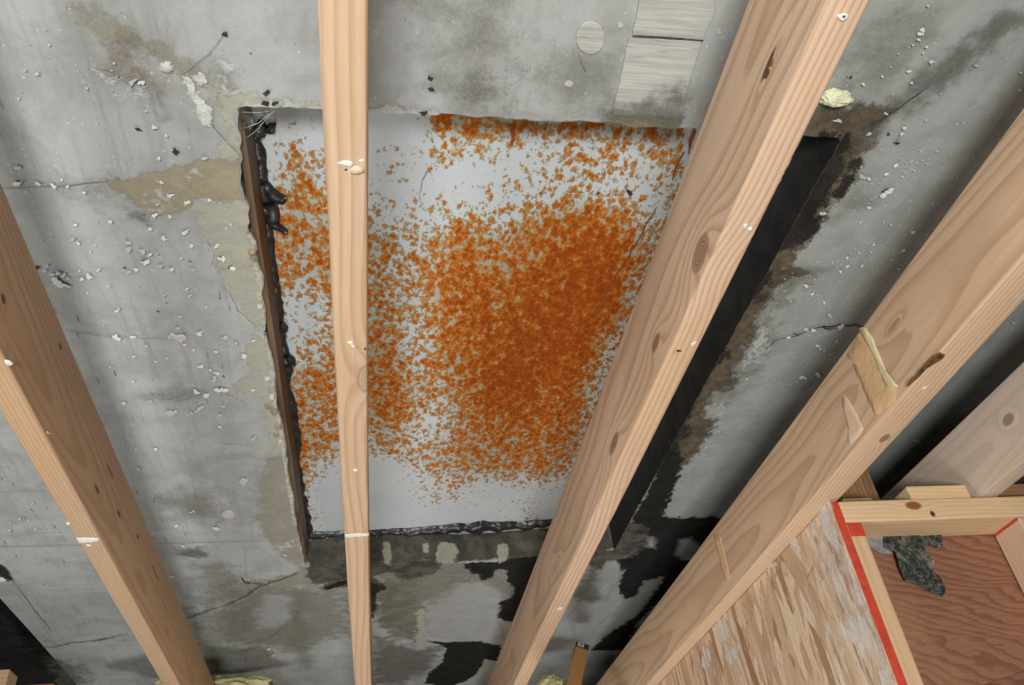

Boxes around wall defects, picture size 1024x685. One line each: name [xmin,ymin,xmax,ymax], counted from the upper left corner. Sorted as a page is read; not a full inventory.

damp [910,14,1020,91]
rust [263,110,340,532]
rust [368,113,696,520]
crack [767,324,863,348]
crack [186,573,299,619]
damp [370,556,538,685]